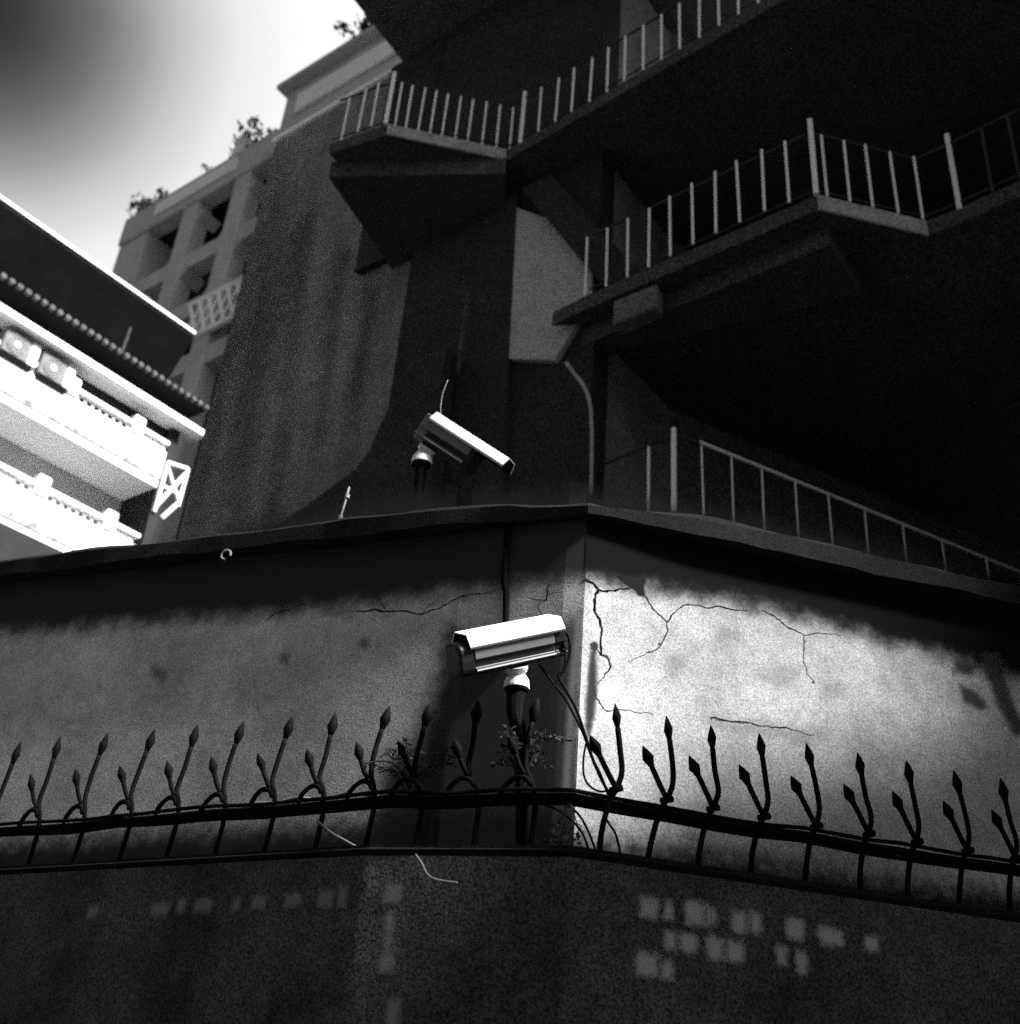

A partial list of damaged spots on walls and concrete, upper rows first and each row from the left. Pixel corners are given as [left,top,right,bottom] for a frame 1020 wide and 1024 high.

crack [356,578,840,714]
crack [710,717,815,735]